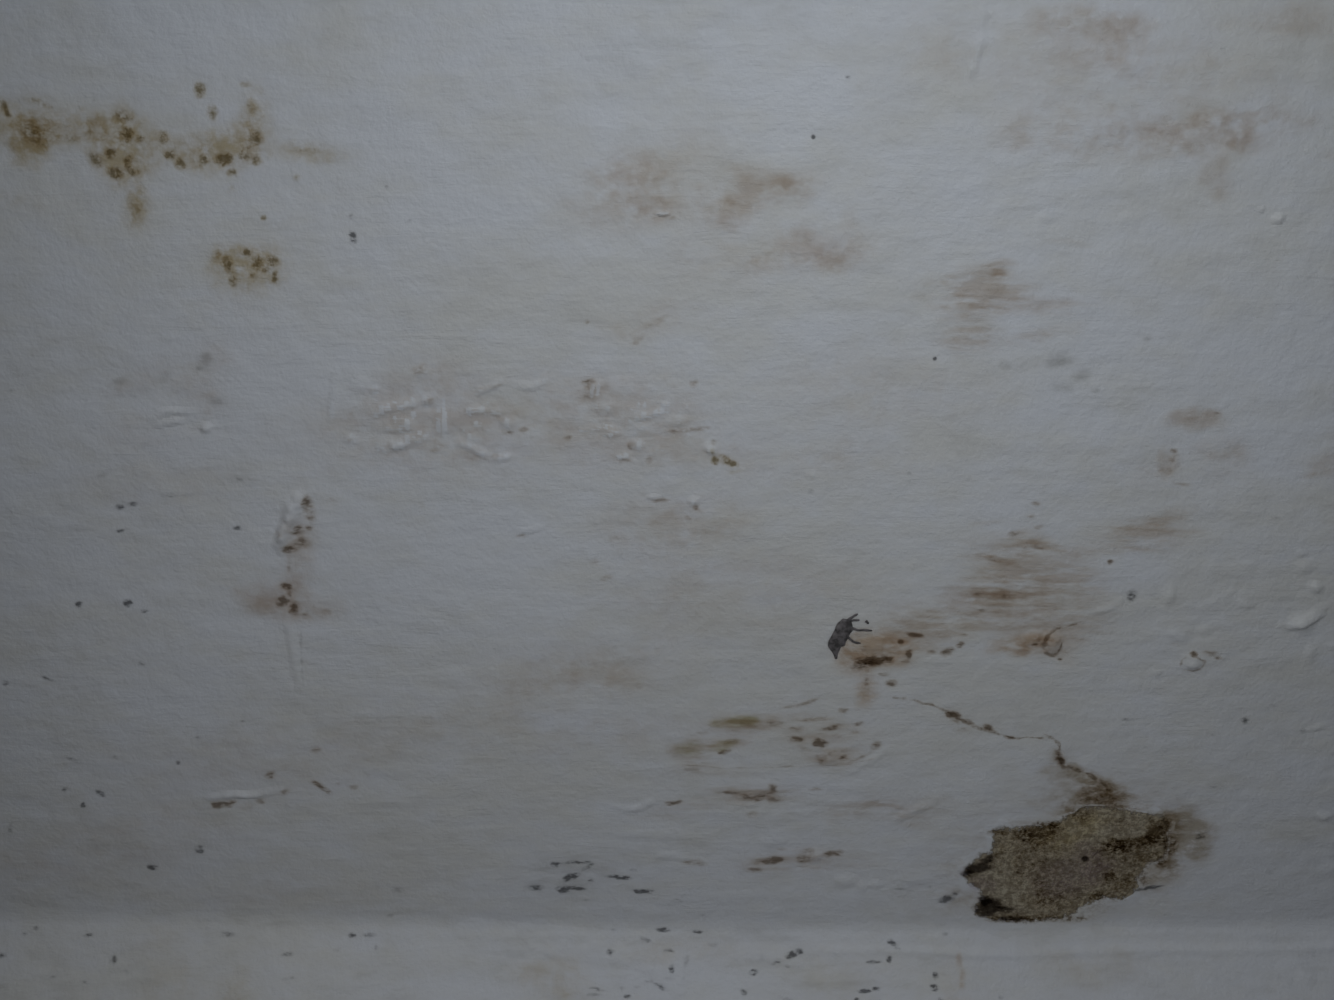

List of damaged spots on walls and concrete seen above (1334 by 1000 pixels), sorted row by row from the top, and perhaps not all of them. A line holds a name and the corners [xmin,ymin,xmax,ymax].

peeling [944,789,1187,939]